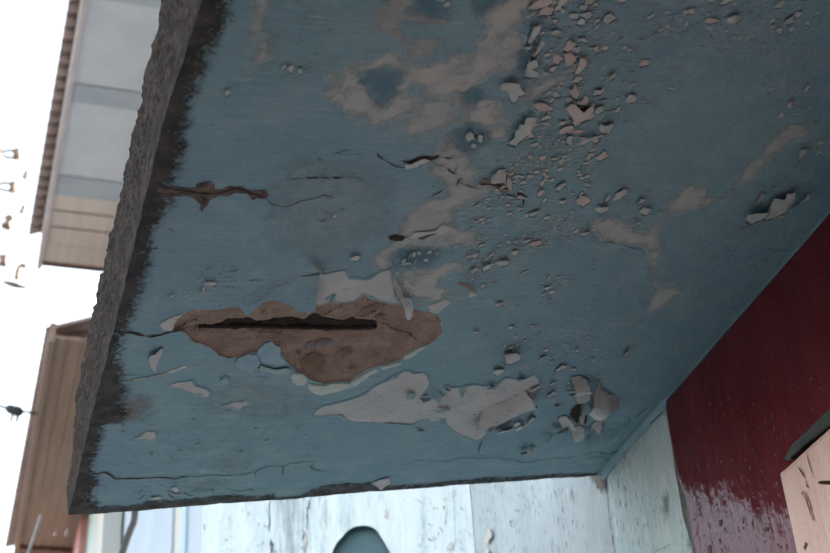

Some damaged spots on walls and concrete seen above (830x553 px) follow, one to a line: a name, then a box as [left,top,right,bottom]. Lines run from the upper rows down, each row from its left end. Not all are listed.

crack [157,150,527,212]
crack [388,224,451,241]
peeling [449,0,830,300]
spalling [160,263,630,453]